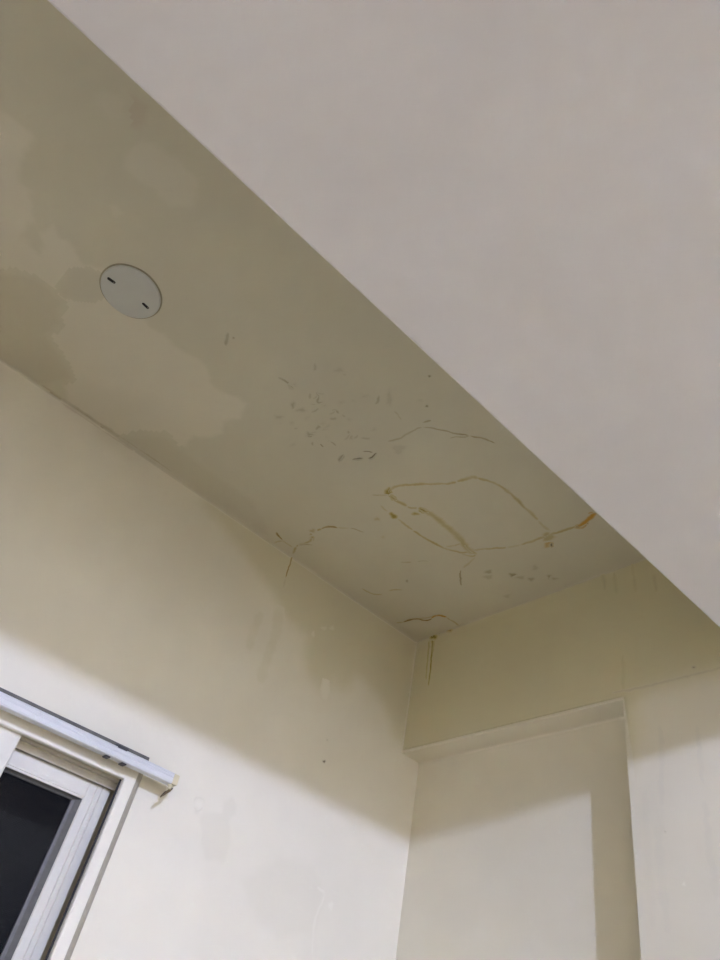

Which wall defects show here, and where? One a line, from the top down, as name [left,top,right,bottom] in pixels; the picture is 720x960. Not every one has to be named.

leakage [0,83,720,788]
crack [387,411,496,457]
crack [273,474,597,589]
crack [396,614,461,627]